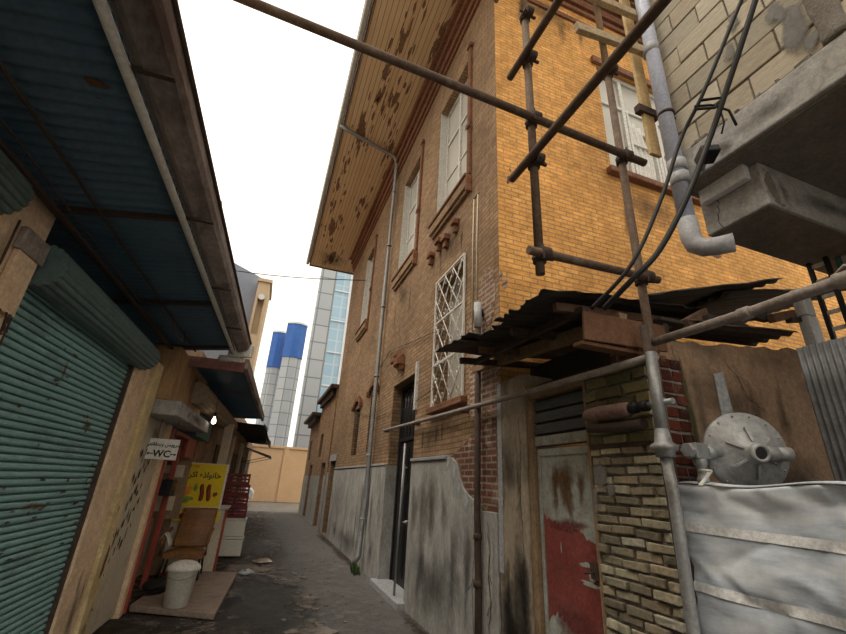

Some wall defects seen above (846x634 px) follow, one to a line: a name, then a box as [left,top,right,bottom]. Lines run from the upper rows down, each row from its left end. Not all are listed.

peeling [385,0,427,60]
peeling [321,64,422,266]
corrosion [552,469,583,515]
water stain [503,568,513,634]
water stain [519,559,528,634]